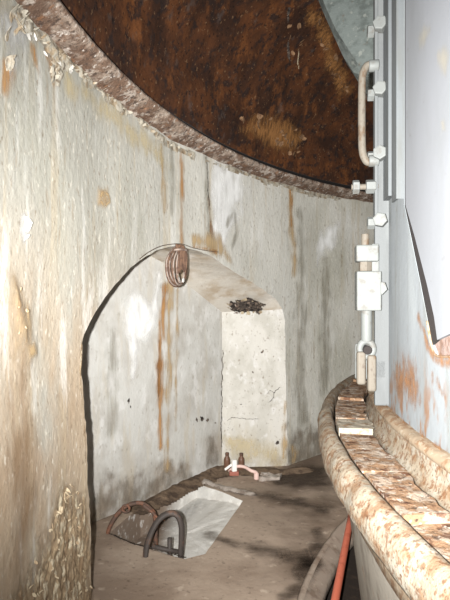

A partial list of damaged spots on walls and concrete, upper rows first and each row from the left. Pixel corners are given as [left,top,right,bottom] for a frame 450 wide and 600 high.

spalling [1,4,195,161]
rust [287,7,305,69]
rust [157,282,178,449]
rust [396,365,418,401]
spalling [15,484,93,600]